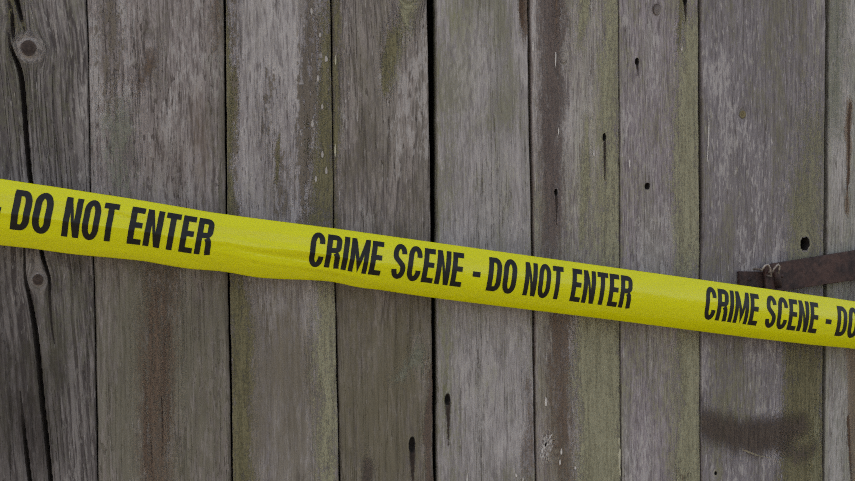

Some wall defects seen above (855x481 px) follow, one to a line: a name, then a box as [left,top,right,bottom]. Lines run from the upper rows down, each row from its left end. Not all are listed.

crack [8,0,33,184]
crack [20,248,55,481]